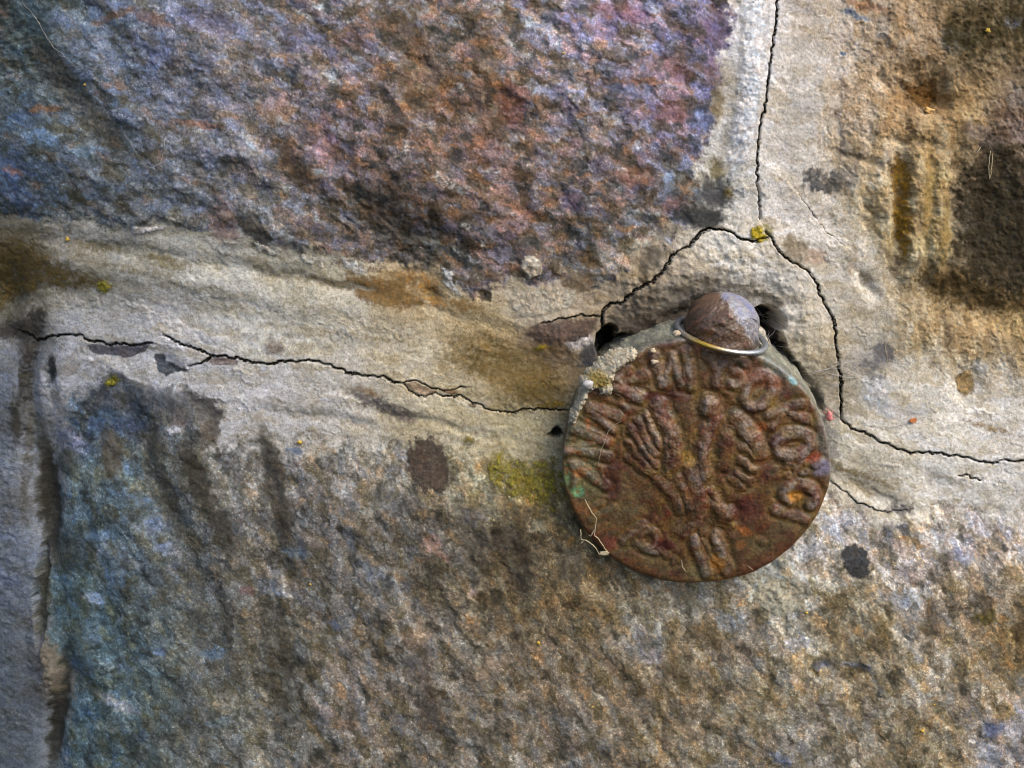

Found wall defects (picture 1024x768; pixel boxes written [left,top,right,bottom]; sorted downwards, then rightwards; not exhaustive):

crack [540,0,1024,481]
crack [25,331,566,414]
crack [834,483,902,513]